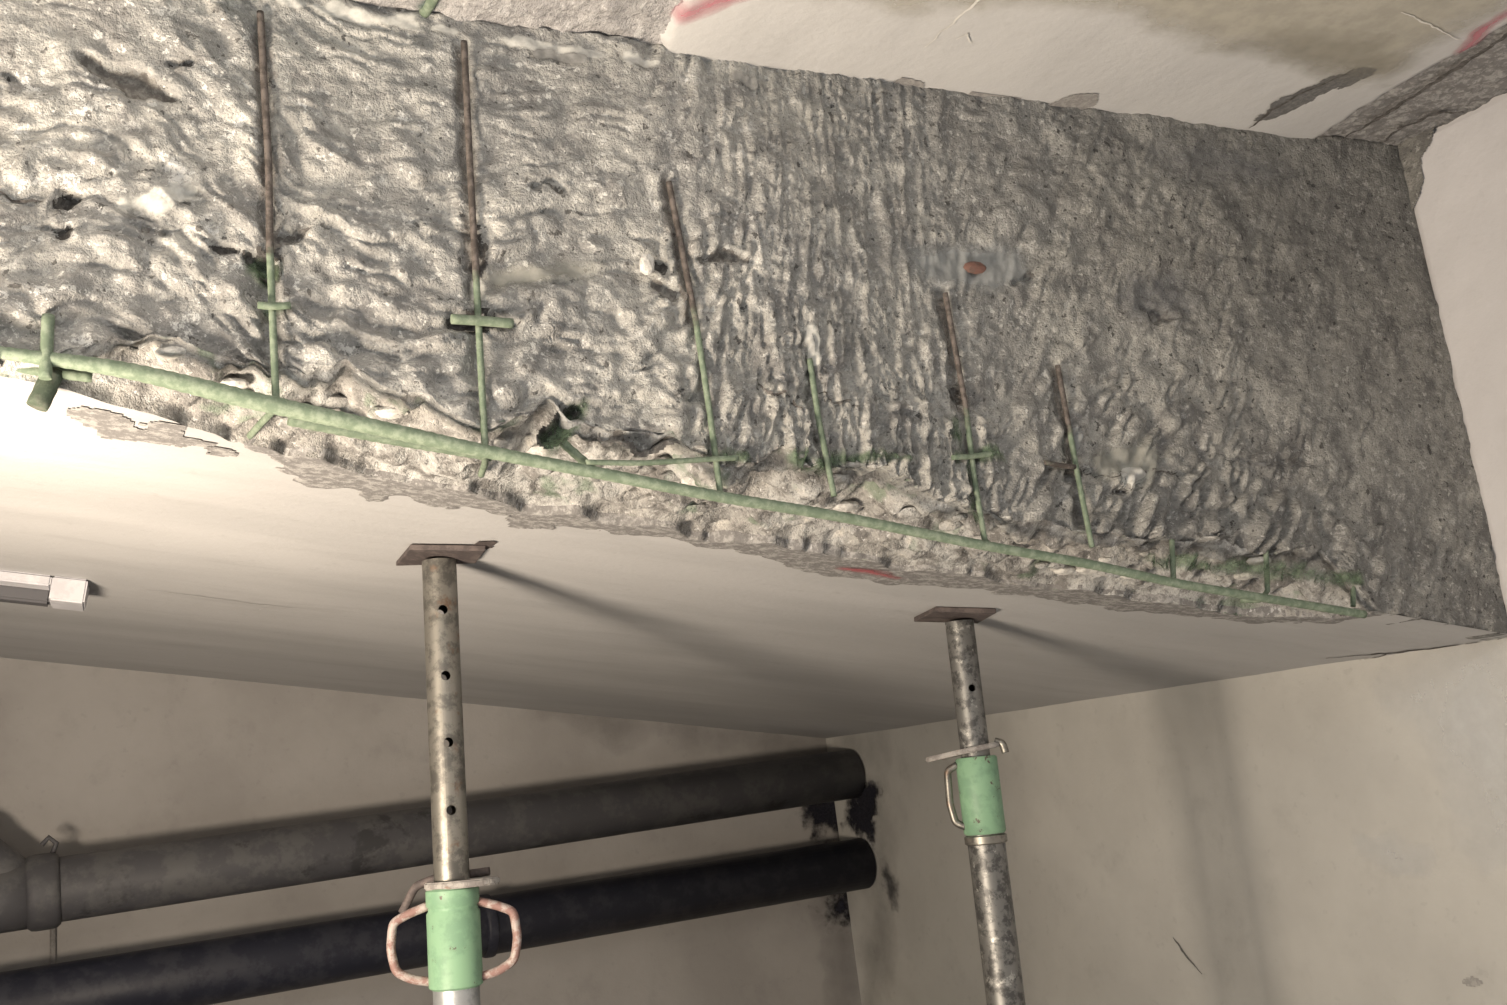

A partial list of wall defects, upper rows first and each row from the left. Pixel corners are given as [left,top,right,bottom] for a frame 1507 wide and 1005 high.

spalling [276,0,683,68]
spalling [78,55,177,103]
peeling [1249,67,1377,128]
spalling [1398,127,1434,211]
spalling [48,194,82,240]
peeling [116,181,198,237]
spalling [208,227,311,283]
spalling [650,262,689,303]
spalling [55,333,1382,624]
water stain [803,782,879,842]
water stain [827,892,850,923]
water stain [883,869,896,899]